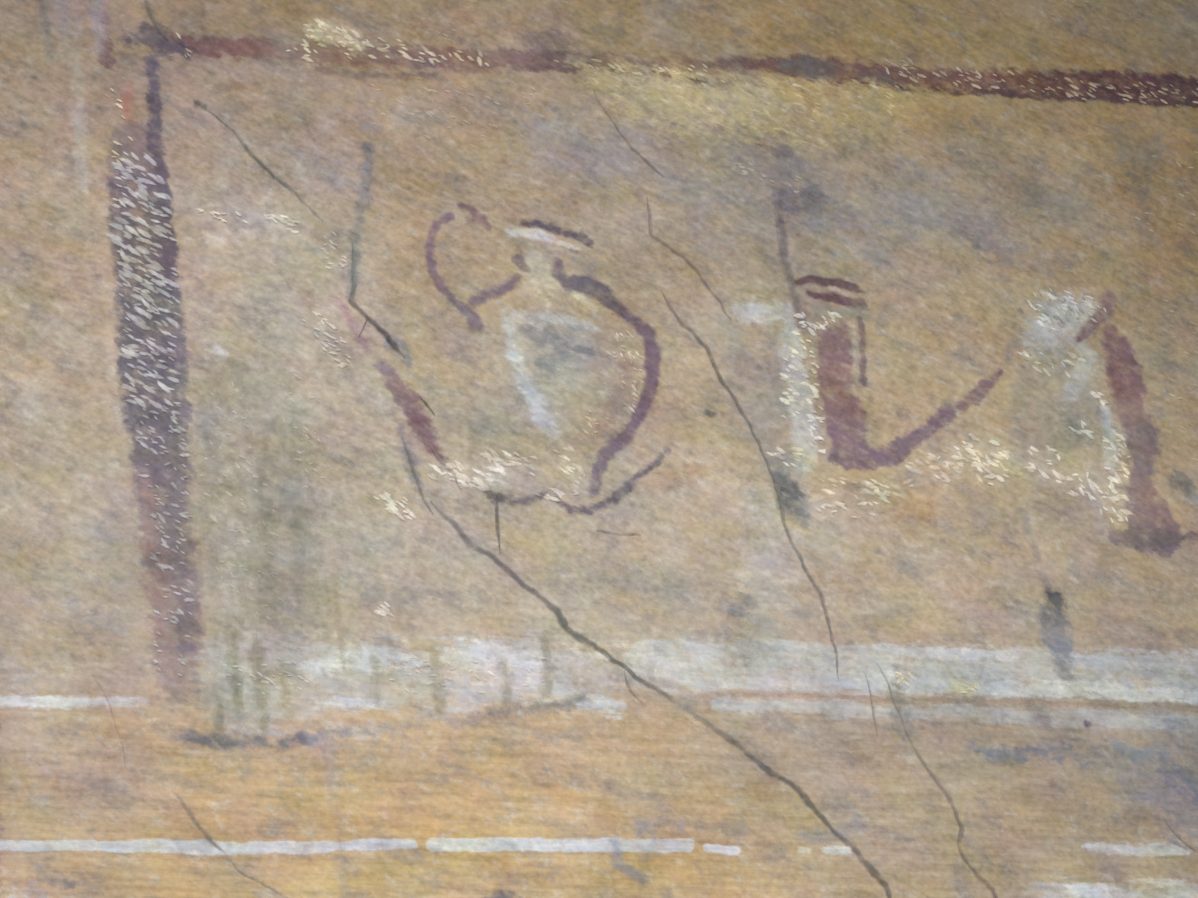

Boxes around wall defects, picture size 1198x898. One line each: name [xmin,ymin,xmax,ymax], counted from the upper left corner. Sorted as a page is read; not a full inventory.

spalling [109,136,192,569]
crack [348,242,405,357]
crack [593,90,665,177]
crack [647,201,730,318]
crack [404,444,891,898]
crack [661,289,997,898]